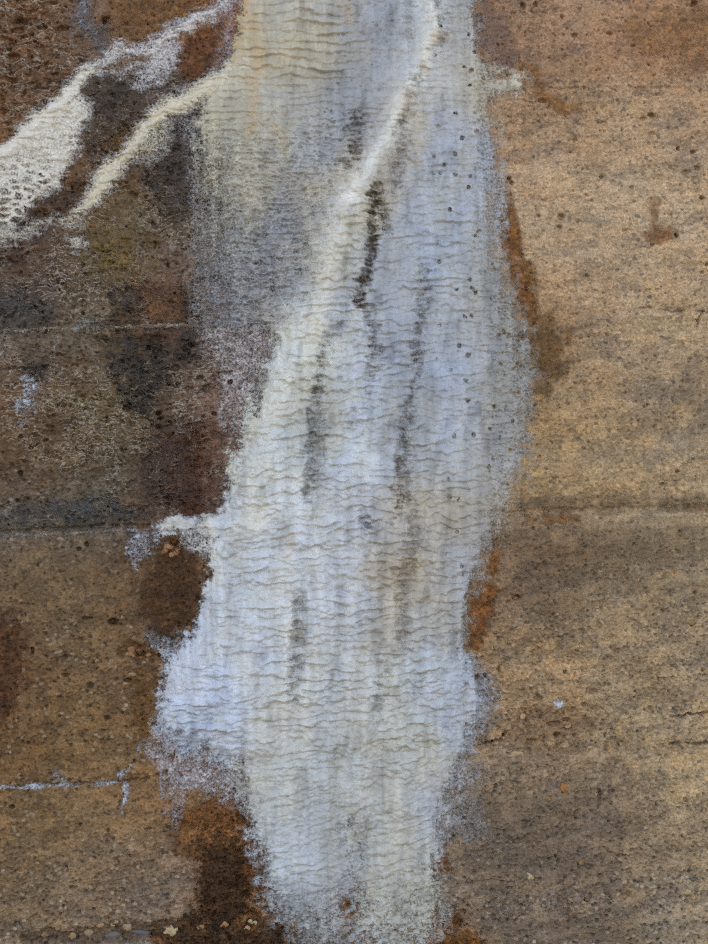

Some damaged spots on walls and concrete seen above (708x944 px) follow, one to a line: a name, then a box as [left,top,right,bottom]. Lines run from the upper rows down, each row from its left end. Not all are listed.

leakage [0,0,545,944]
corrosion [151,799,297,944]
corrosion [431,852,450,877]
corrosion [439,914,483,944]